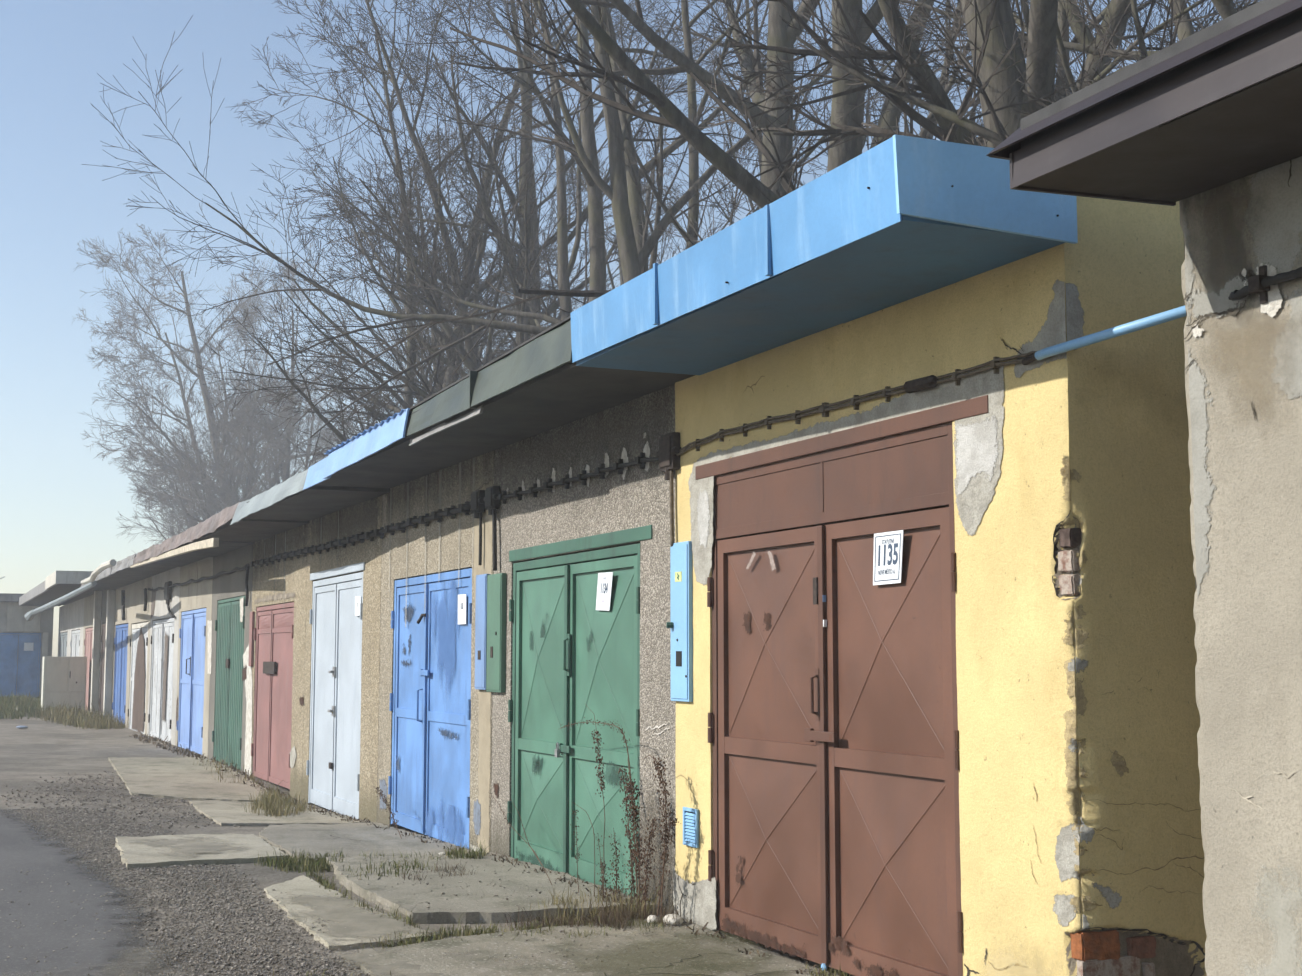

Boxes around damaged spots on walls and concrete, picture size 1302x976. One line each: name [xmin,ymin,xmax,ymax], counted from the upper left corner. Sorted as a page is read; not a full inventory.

spalling [1014,279,1085,378]
spalling [1052,458,1205,976]
crack [1081,752,1204,894]